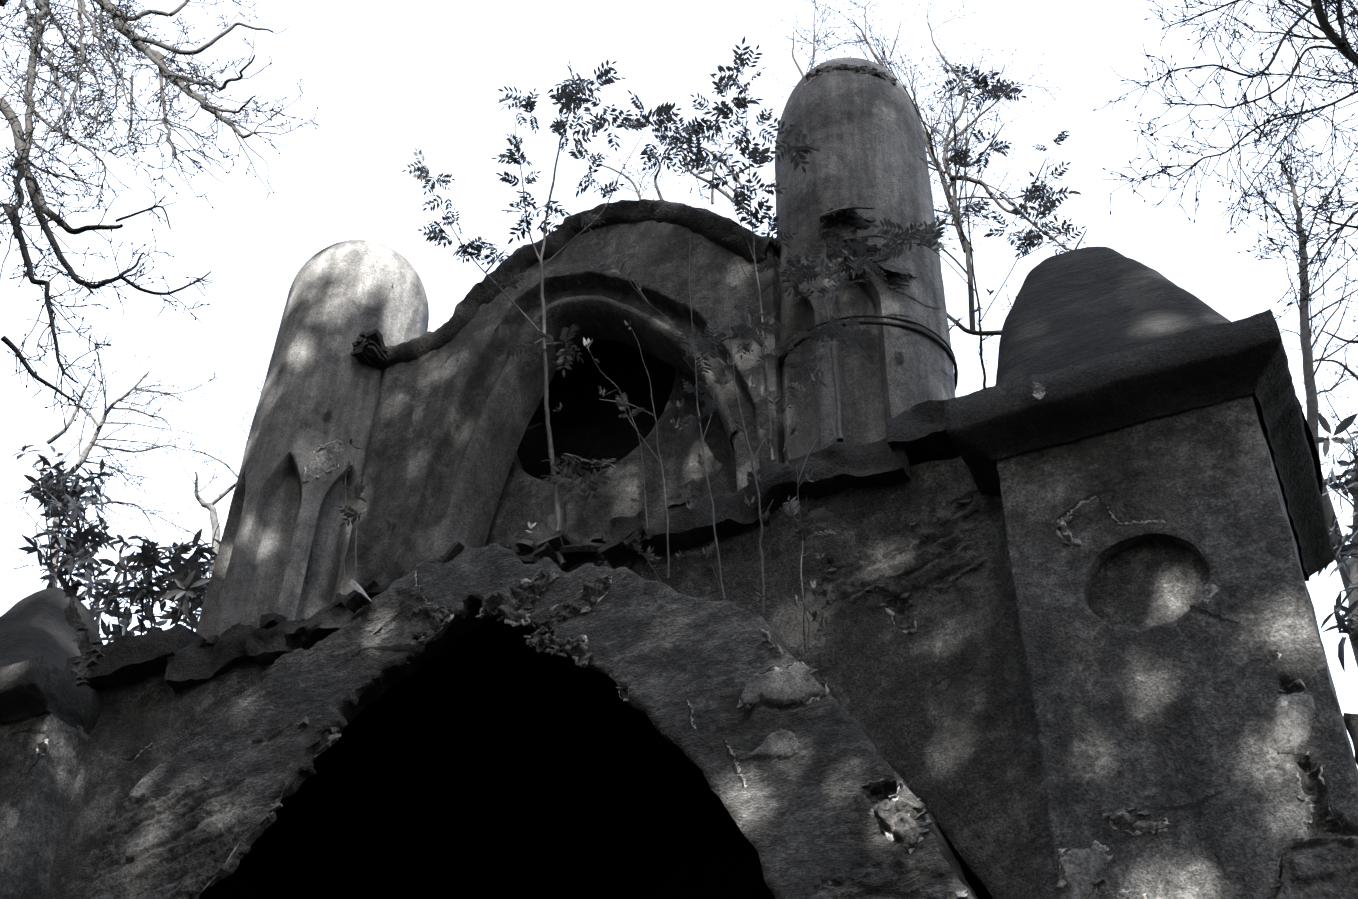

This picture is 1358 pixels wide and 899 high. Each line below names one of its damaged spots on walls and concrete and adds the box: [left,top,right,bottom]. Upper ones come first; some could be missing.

crack [1058,471,1166,525]
spalling [475,567,612,668]
flaking render [736,629,829,709]
flaking render [748,728,800,757]
flaking render [1102,807,1170,836]
flaking render [1268,751,1358,899]
flaking render [1057,840,1147,899]